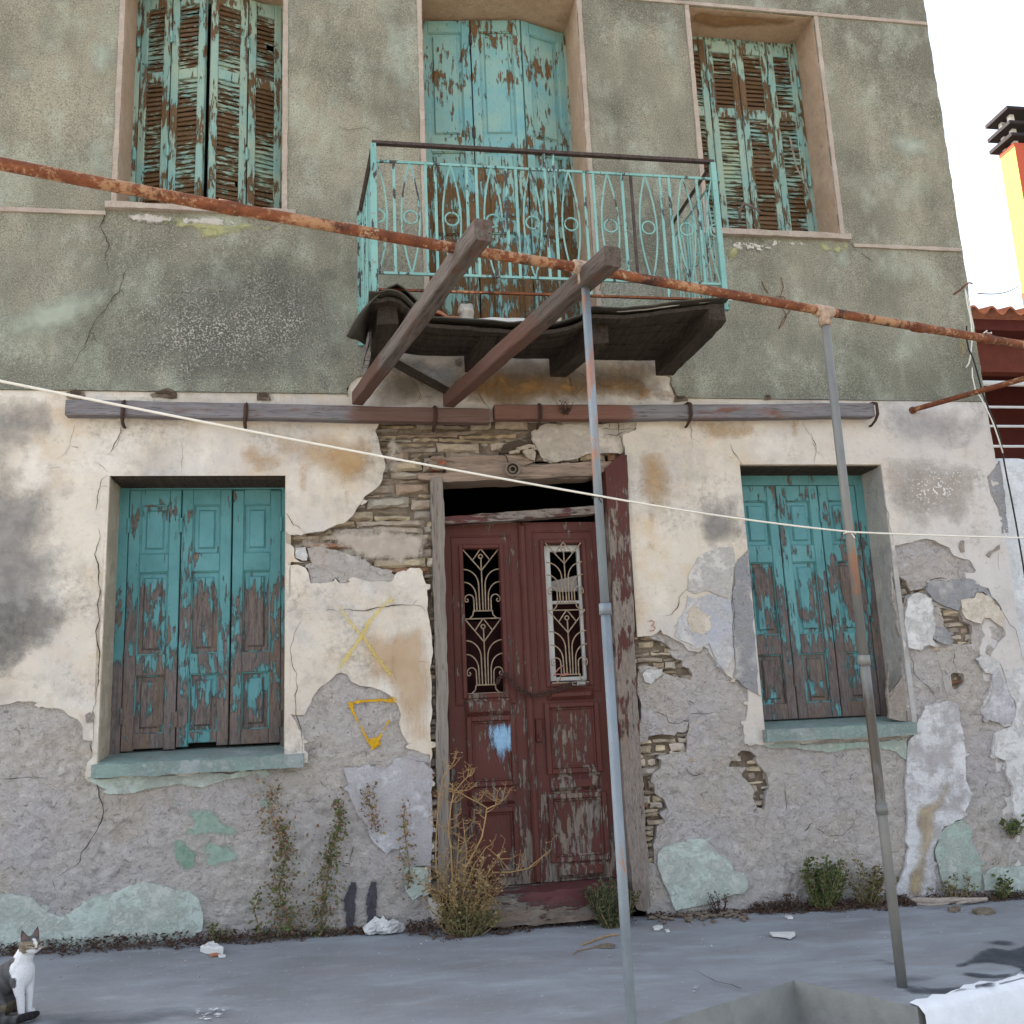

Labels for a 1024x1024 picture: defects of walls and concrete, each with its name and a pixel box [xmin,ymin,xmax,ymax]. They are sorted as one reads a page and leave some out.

crack [68,208,133,375]
damp [0,496,62,666]
flaking render [0,422,636,952]
flaking render [635,539,1024,916]
crack [52,784,106,890]